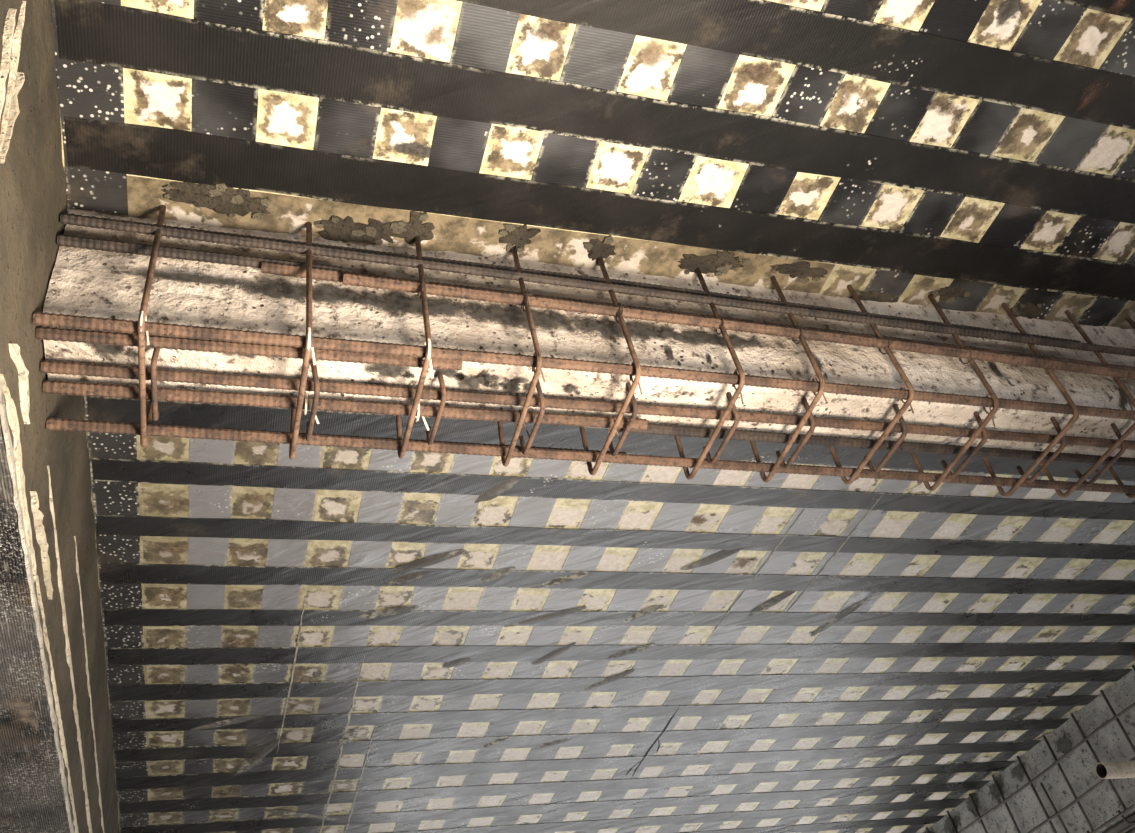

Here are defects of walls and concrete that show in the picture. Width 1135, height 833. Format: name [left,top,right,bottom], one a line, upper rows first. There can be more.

spalling [161,181,271,219]
spalling [314,211,435,247]
spalling [499,223,541,253]
spalling [583,235,616,266]
spalling [677,250,752,276]
spalling [770,261,828,284]
spalling [848,289,898,303]
spalling [928,286,971,303]
damp [111,270,784,368]
spalling [1010,302,1044,319]
damp [365,364,415,385]